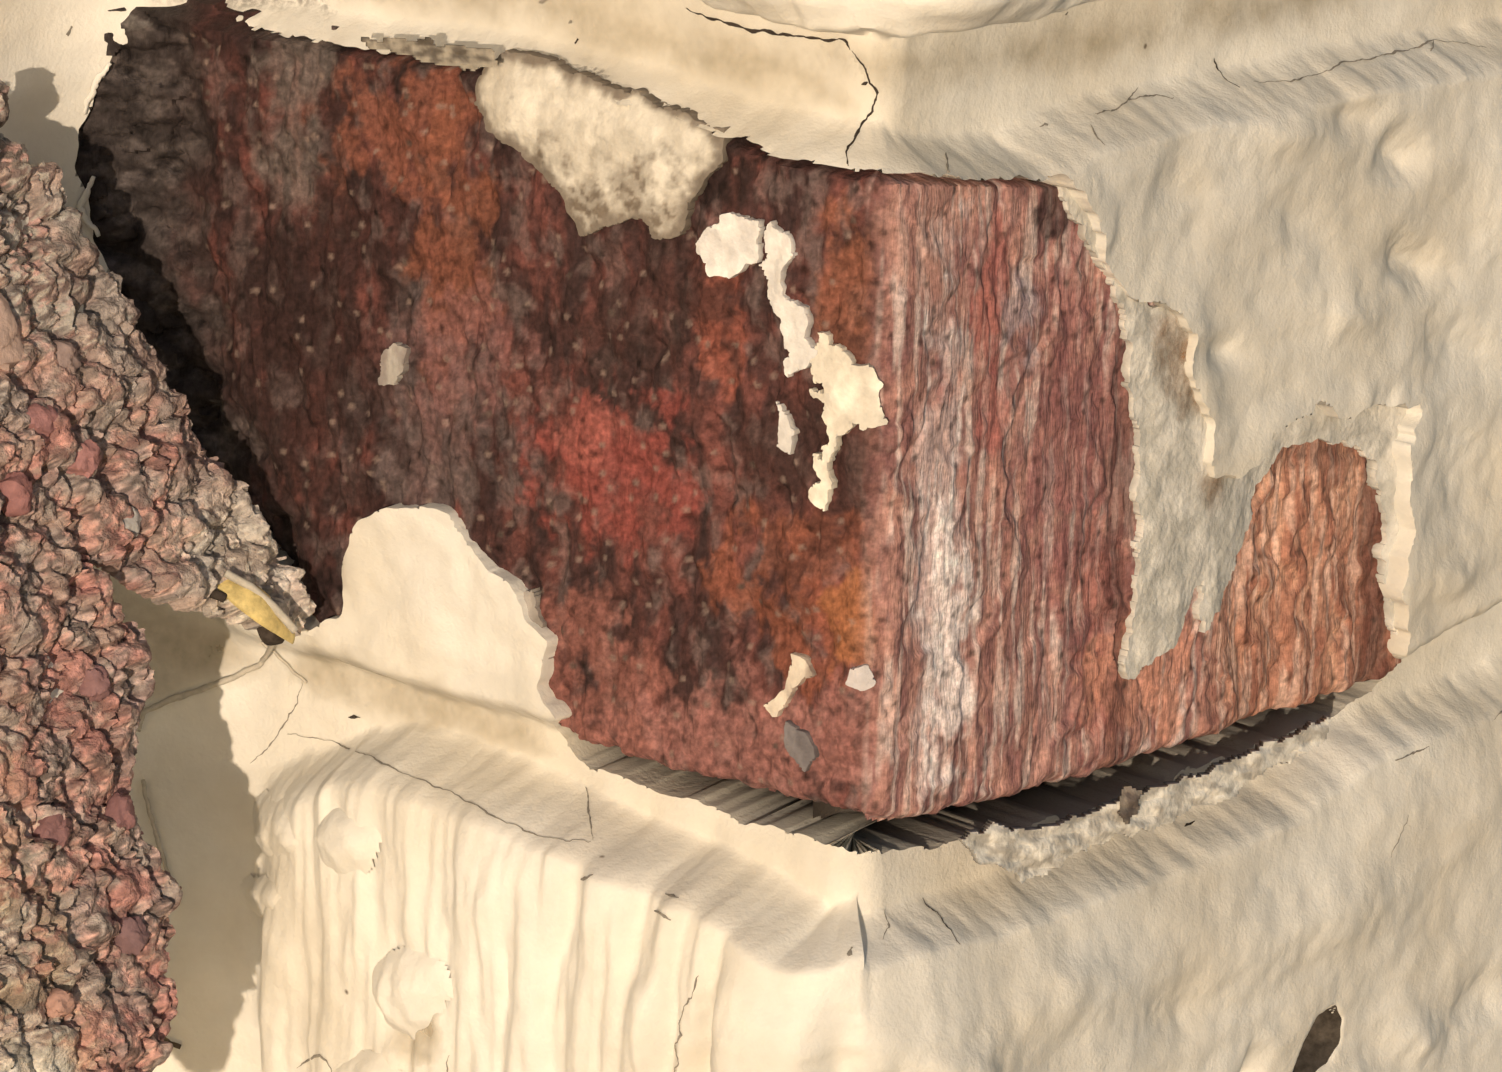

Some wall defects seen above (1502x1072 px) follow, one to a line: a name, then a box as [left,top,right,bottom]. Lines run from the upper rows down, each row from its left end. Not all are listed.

peeling [0,80,10,128]
crack [686,8,879,166]
spalling [75,0,1407,822]
corrosion [1173,341,1188,365]
peeling [0,133,316,1072]
crack [251,684,593,843]
spalling [957,715,1331,884]
spalling [1293,1005,1342,1072]